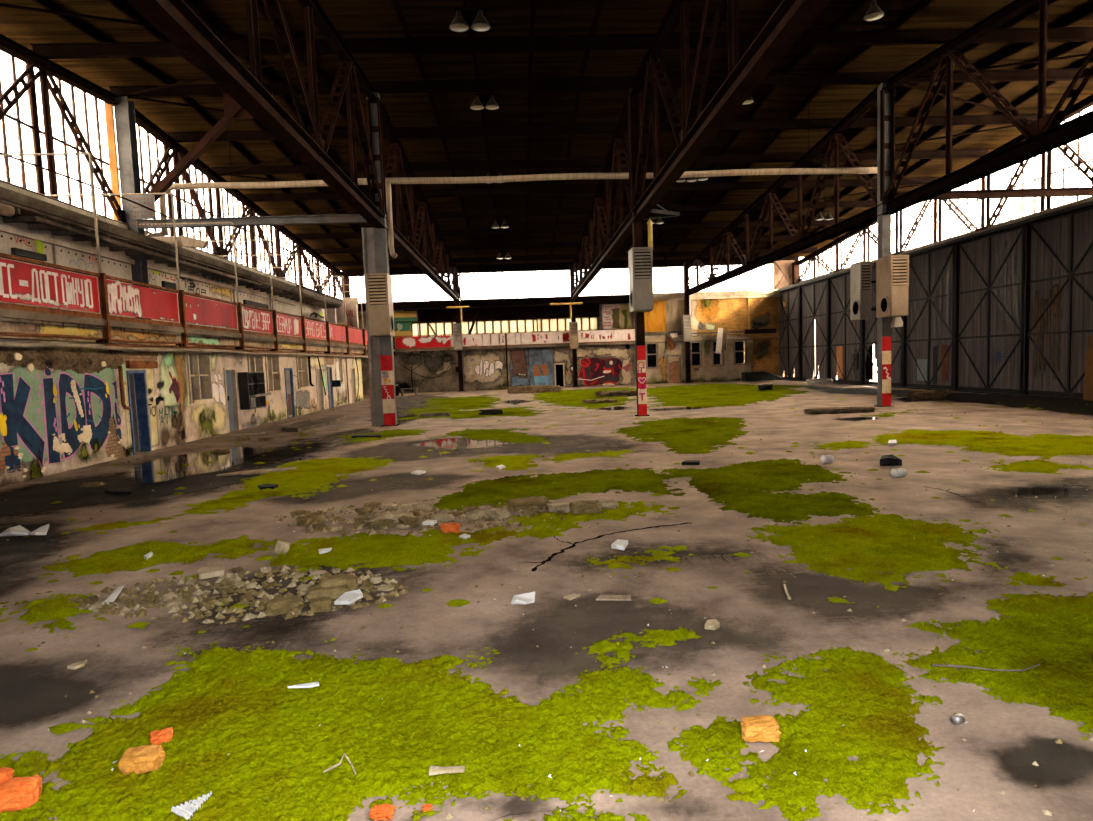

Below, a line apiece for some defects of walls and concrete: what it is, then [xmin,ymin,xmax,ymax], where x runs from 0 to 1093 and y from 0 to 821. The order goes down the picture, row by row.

leakage [0,395,643,596]
spalling [440,522,461,533]
crack [516,523,688,571]
leakage [959,476,1093,511]
leakage [158,565,429,654]
leakage [362,641,414,661]
leakage [481,592,781,685]
leakage [0,661,124,729]